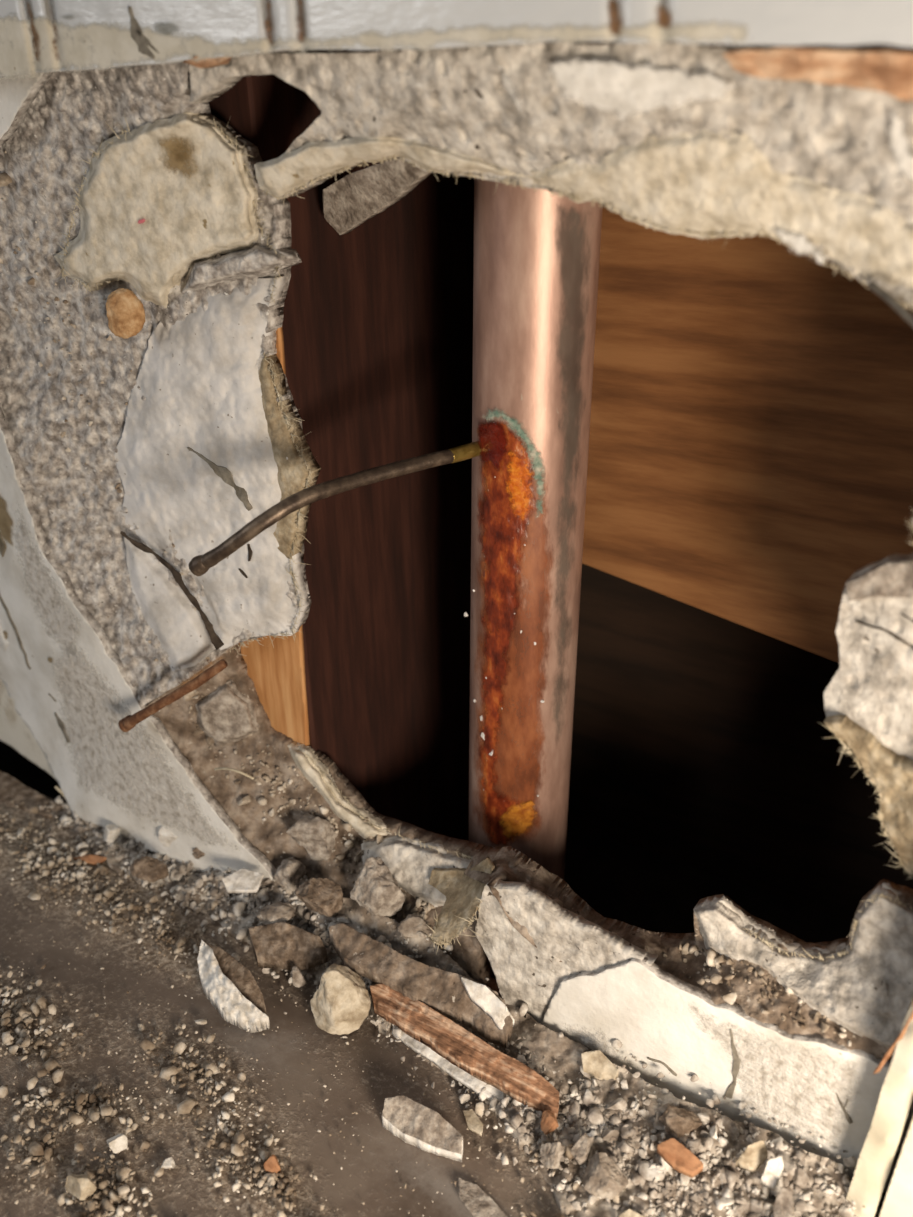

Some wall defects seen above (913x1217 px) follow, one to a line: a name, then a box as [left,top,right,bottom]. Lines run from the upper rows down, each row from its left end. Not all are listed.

flaking render [0,16,913,708]
crack [0,595,31,669]
crack [48,693,70,743]
flaking render [0,497,232,846]
corrosion [476,421,552,845]
flaking render [818,553,913,879]
crack [856,613,913,648]
flaking render [153,643,913,1059]
flaking render [463,1109,483,1137]
flaking render [563,1027,632,1081]
flaking render [691,1007,857,1147]